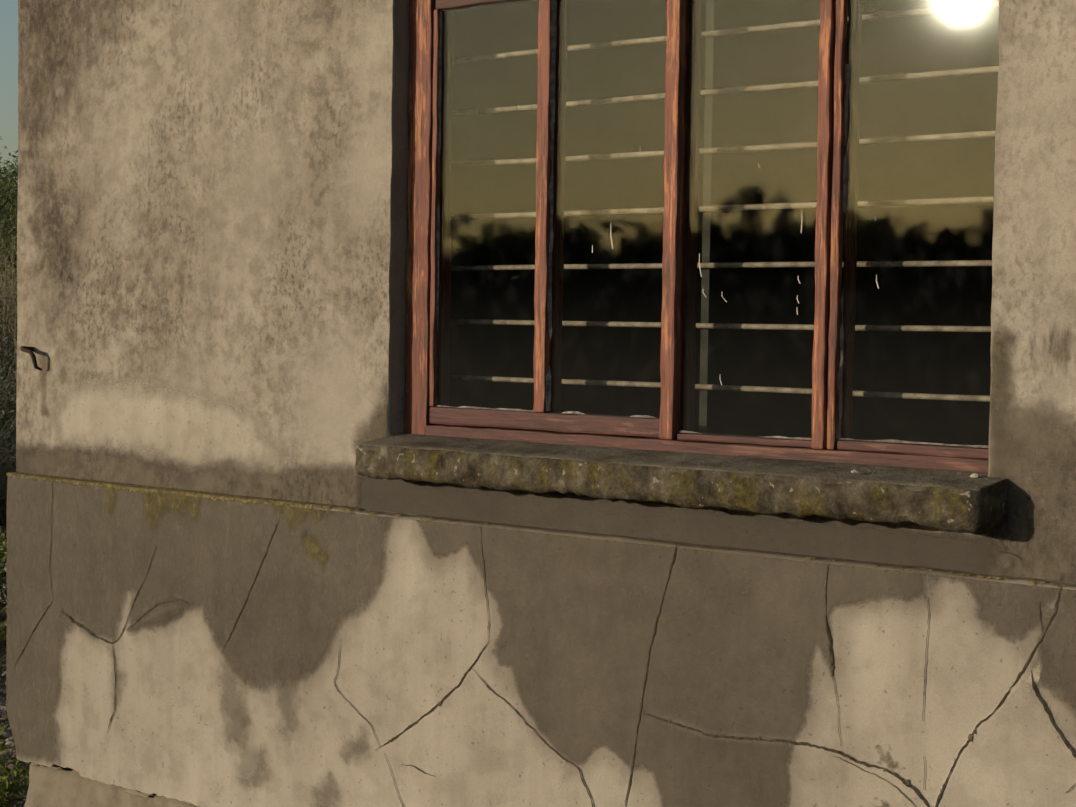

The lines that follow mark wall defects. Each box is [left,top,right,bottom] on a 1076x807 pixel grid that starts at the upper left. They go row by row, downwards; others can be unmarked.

crack [13,472,189,732]
crack [221,516,280,655]
crack [334,525,593,807]
water stain [6,332,1076,807]
crack [625,544,1076,807]